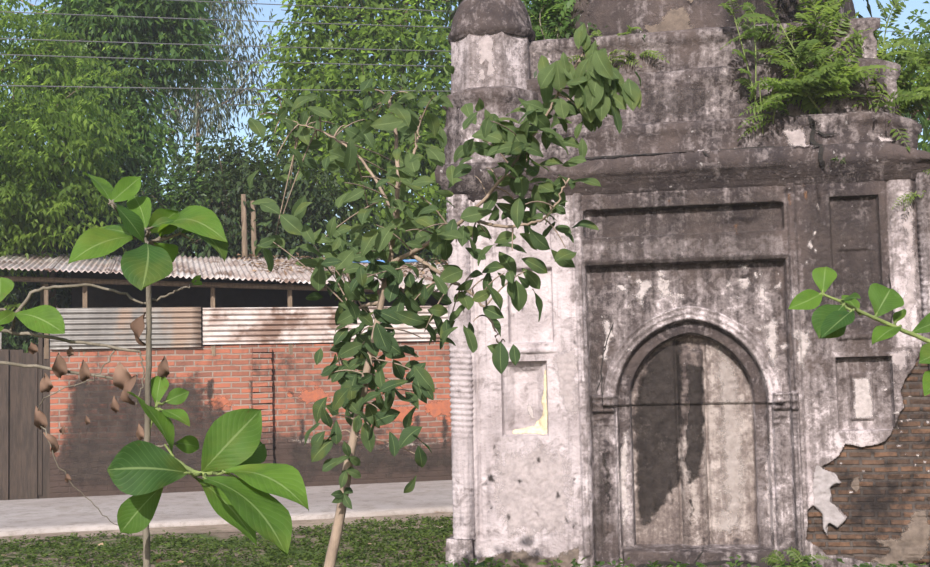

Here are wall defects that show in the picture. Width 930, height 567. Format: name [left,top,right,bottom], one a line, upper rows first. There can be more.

flaking render [902,191,917,331]
damp [632,340,705,525]
spalling [806,350,930,566]